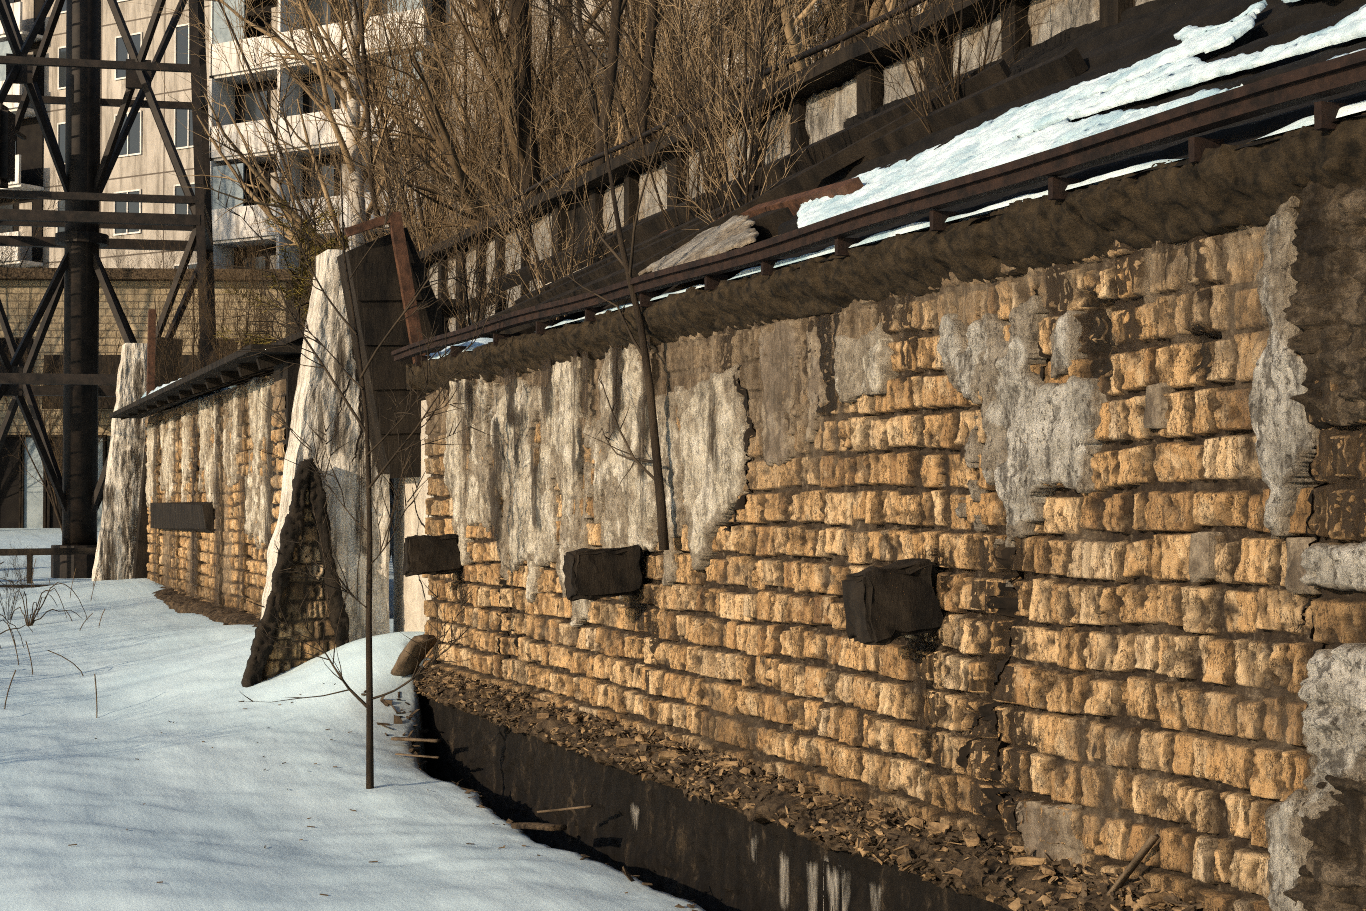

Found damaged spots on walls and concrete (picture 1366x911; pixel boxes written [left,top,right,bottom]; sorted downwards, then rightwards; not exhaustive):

flaking render [145,376,274,550]
leakage [456,367,538,542]
leakage [608,336,651,513]
leakage [630,545,663,722]
flaking render [443,319,900,627]
leakage [875,292,918,382]
flaking render [937,286,1118,548]
leakage [1044,263,1075,336]
leakage [1113,235,1213,351]
spalling [1186,322,1222,377]
peeling [1189,532,1224,583]
peeling [1015,801,1087,870]